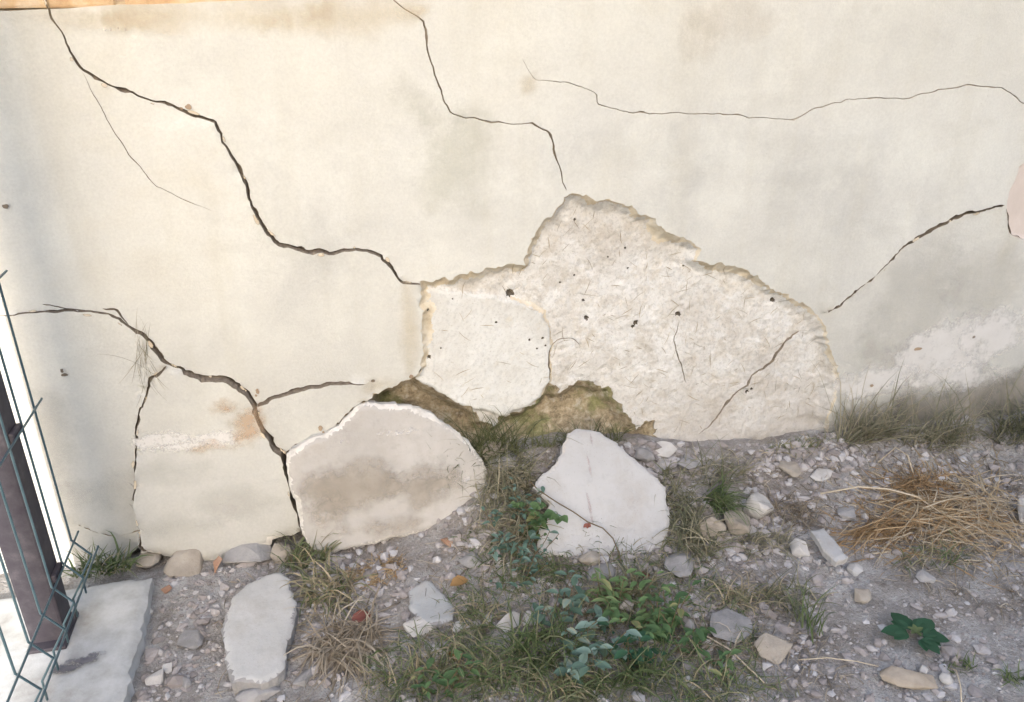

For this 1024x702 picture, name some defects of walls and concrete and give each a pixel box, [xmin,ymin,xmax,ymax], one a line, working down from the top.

crack [44,0,420,285]
crack [394,0,566,189]
crack [524,62,1024,121]
crack [0,304,373,551]
spalling [409,193,839,442]
crack [699,331,799,434]
crack [828,205,1004,312]